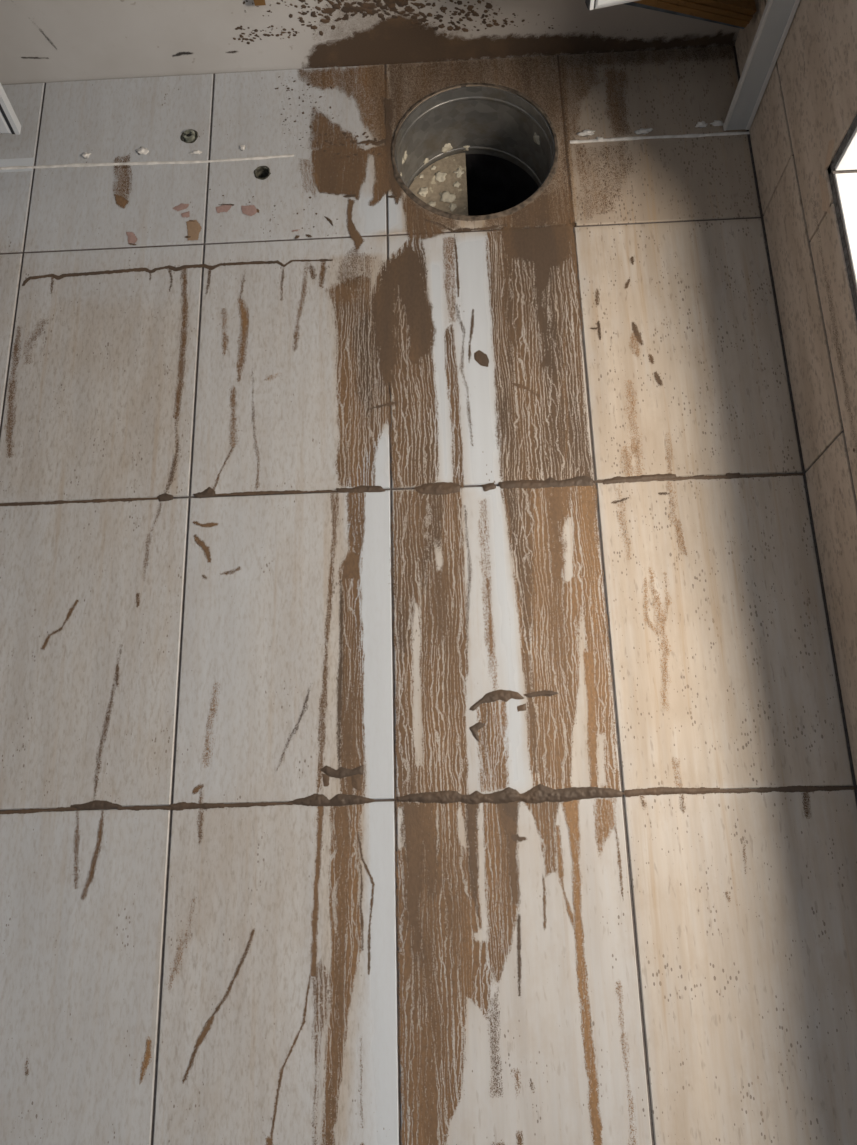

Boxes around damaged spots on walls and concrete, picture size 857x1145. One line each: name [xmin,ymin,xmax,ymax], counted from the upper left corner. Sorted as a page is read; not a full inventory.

leakage [312,0,467,45]
leakage [163,268,189,494]
leakage [292,33,735,690]
leakage [501,486,604,774]
leakage [310,492,366,1145]
leakage [393,796,445,971]
leakage [463,803,480,916]
leakage [495,801,522,996]
leakage [542,651,624,1145]
leakage [410,1001,440,1145]
leakage [486,987,535,1098]
leakage [615,982,638,1145]